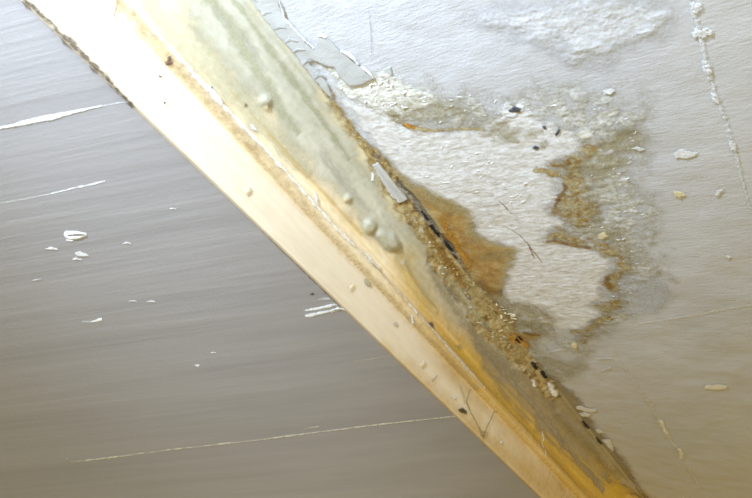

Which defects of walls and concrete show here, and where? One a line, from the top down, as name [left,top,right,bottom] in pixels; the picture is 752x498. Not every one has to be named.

peeling [126,0,485,388]
water stain [138,0,648,498]
crack [395,179,471,278]
spalling [256,0,660,402]
crack [690,2,751,212]